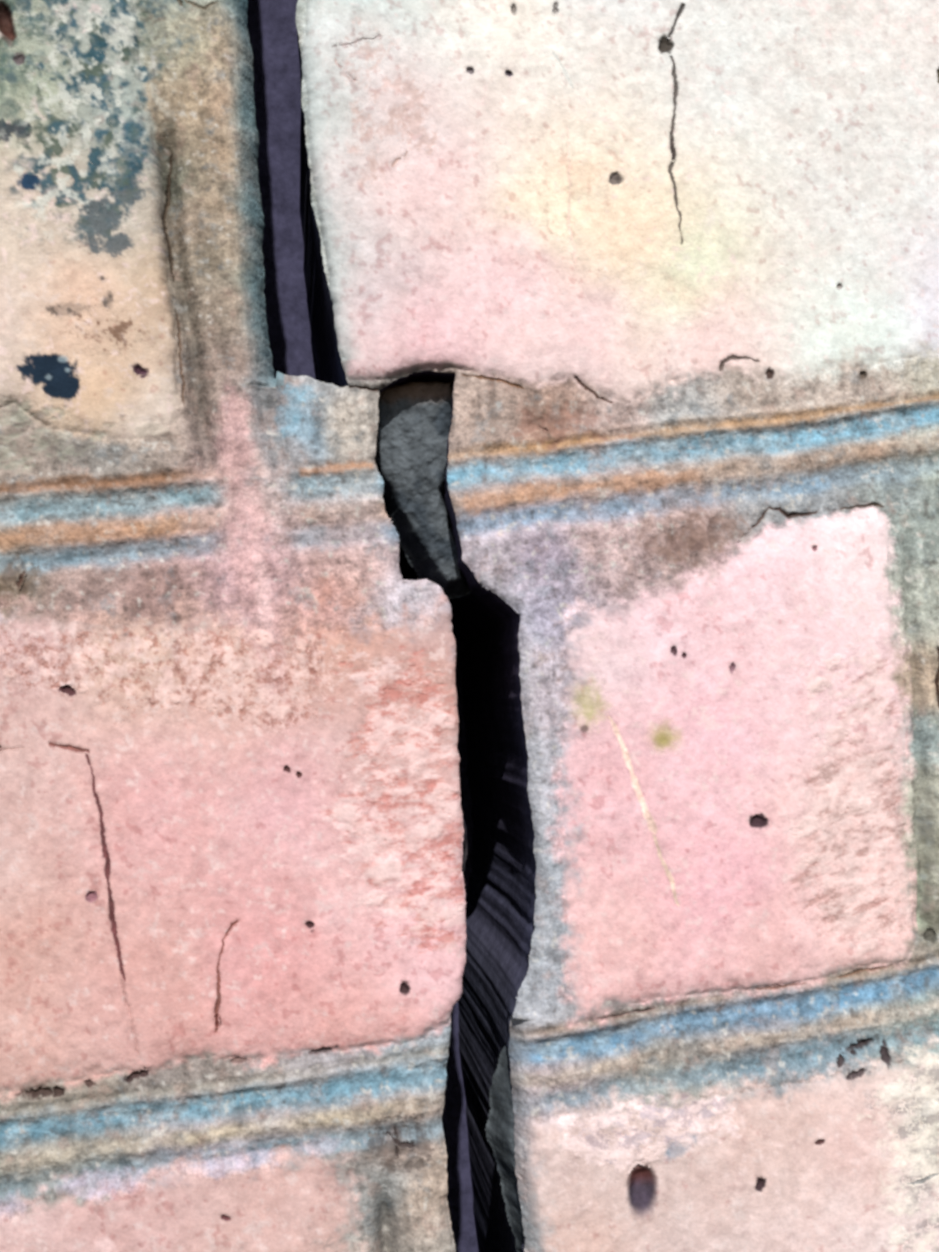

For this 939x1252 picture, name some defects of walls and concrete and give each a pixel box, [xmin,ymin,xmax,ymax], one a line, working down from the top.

water stain [0,0,218,404]
crack [160,148,186,406]
crack [572,374,615,404]
crack [655,3,686,246]
crack [176,0,537,1252]
crack [0,741,152,1102]